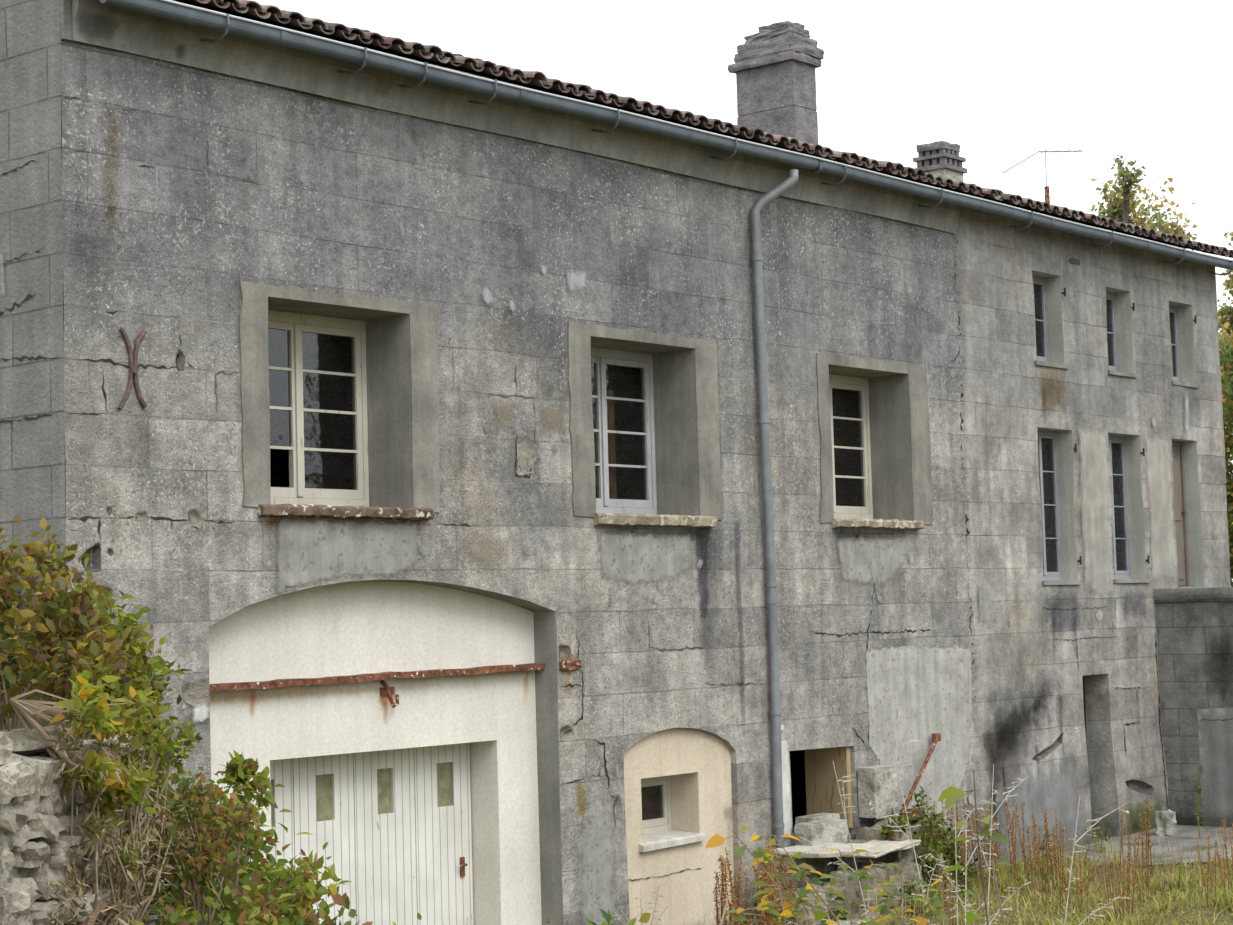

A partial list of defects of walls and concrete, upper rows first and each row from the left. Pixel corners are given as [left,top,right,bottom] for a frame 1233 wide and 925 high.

crack [0,293,36,315]
crack [0,335,236,432]
crack [951,236,976,701]
spalling [81,542,101,573]
crack [561,635,615,798]
crack [811,582,931,750]